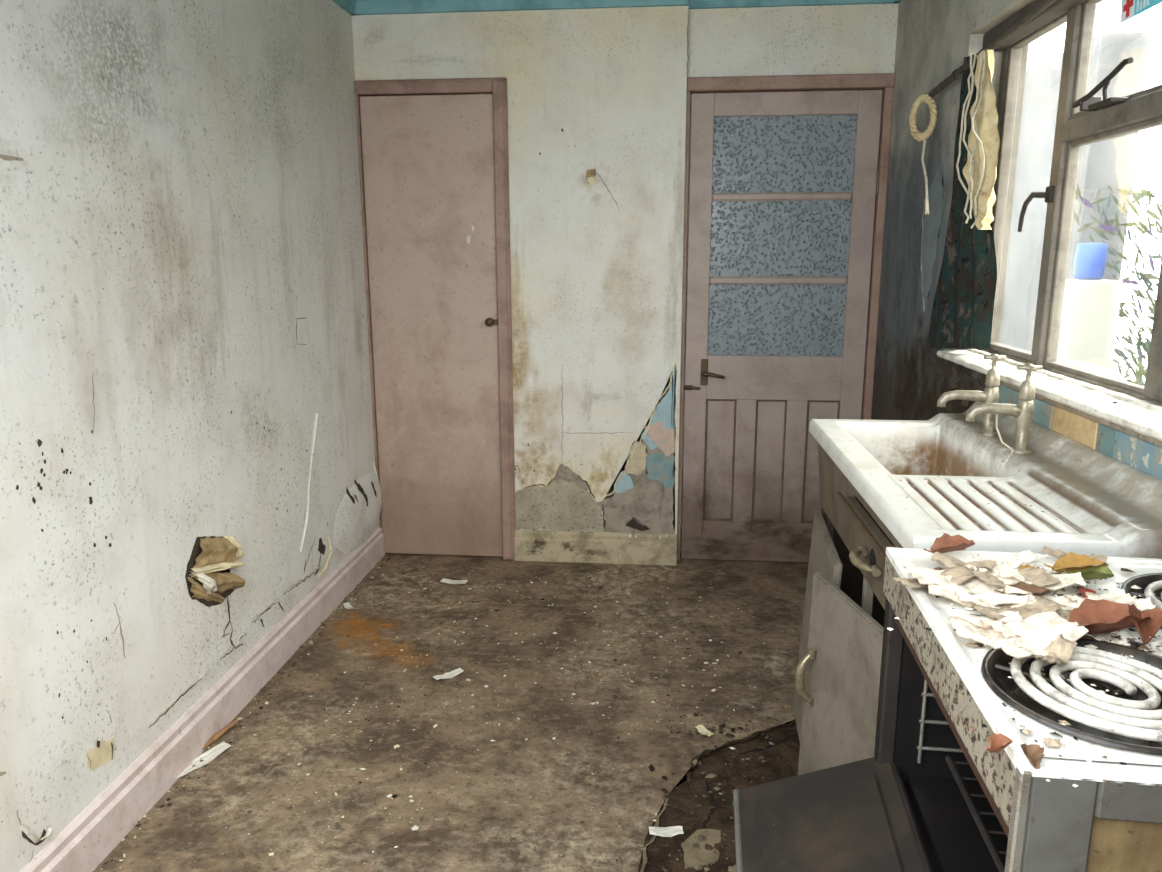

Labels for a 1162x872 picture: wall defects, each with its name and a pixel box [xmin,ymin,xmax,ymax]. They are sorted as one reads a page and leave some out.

spalling [515,372,676,539]
hole [185,536,235,607]
crack [221,597,284,649]
spalling [86,738,115,771]